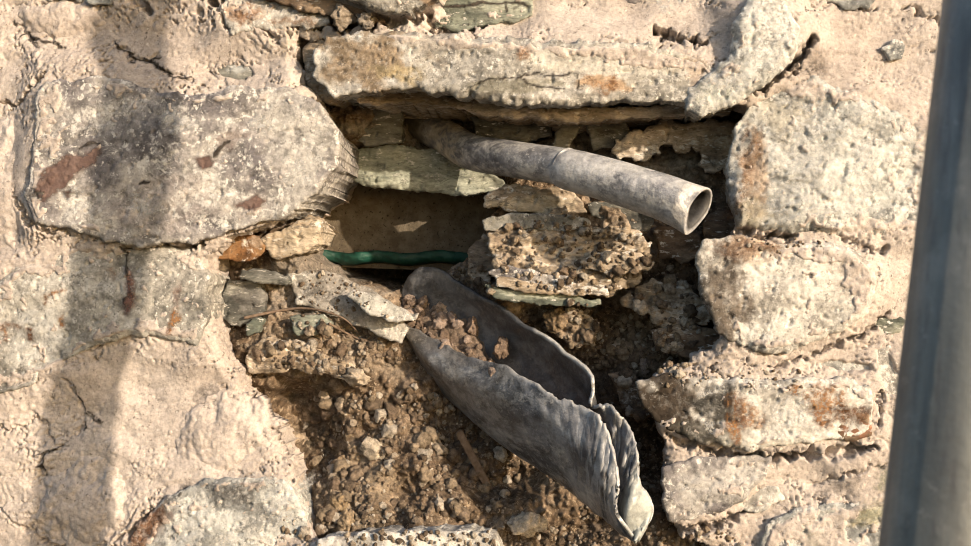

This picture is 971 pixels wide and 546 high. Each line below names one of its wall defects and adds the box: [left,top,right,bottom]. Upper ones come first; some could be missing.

spalling [196,155,215,169]
spalling [236,195,266,211]
rust [726,398,765,444]
rust [793,383,871,427]